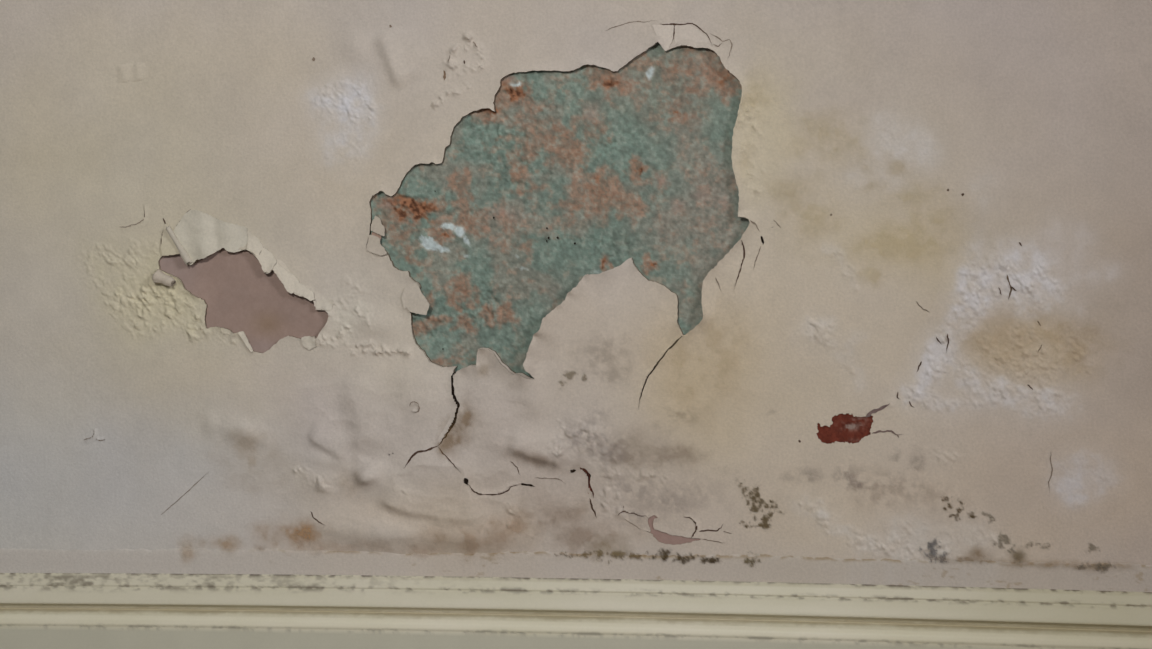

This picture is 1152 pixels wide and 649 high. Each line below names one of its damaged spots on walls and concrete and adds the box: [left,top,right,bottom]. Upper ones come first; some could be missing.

crack [608,21,732,56]
damp [295,61,395,190]
peeling [66,16,776,550]
damp [833,99,1138,526]
crack [633,333,682,408]
crack [406,369,651,530]
damp [565,549,719,564]
crack [684,511,732,543]
damp [741,482,1032,562]